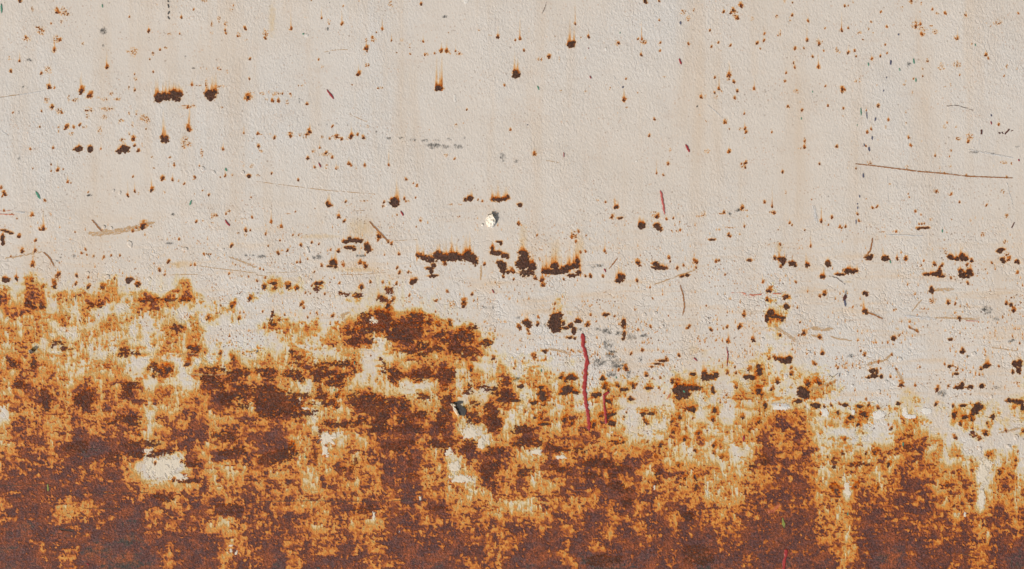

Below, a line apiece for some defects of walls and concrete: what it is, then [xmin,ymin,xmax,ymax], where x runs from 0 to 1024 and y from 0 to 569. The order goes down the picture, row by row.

rust [0,238,1024,569]